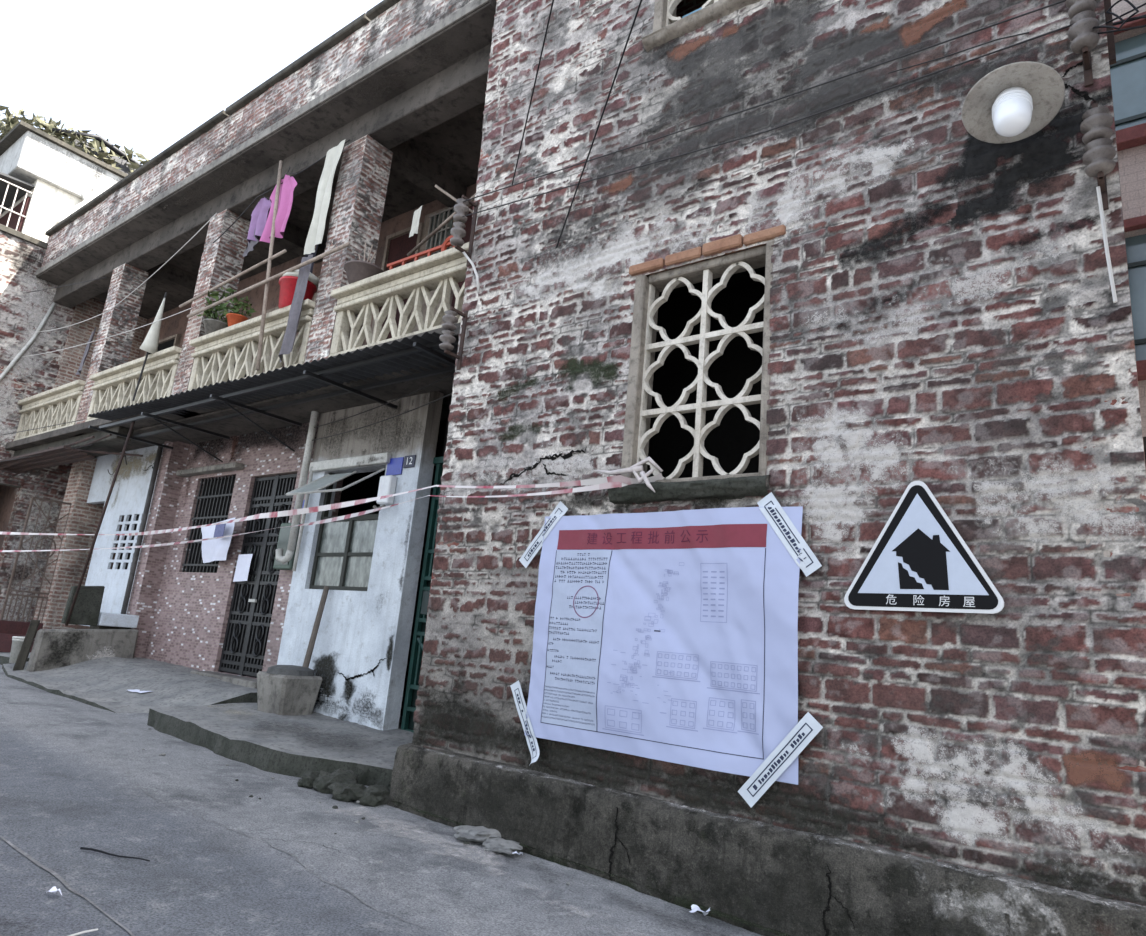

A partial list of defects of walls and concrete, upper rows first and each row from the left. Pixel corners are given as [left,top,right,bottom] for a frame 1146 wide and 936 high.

crack [500,447,587,485]
damp [313,655,381,724]
crack [337,658,387,697]
crack [822,865,855,936]